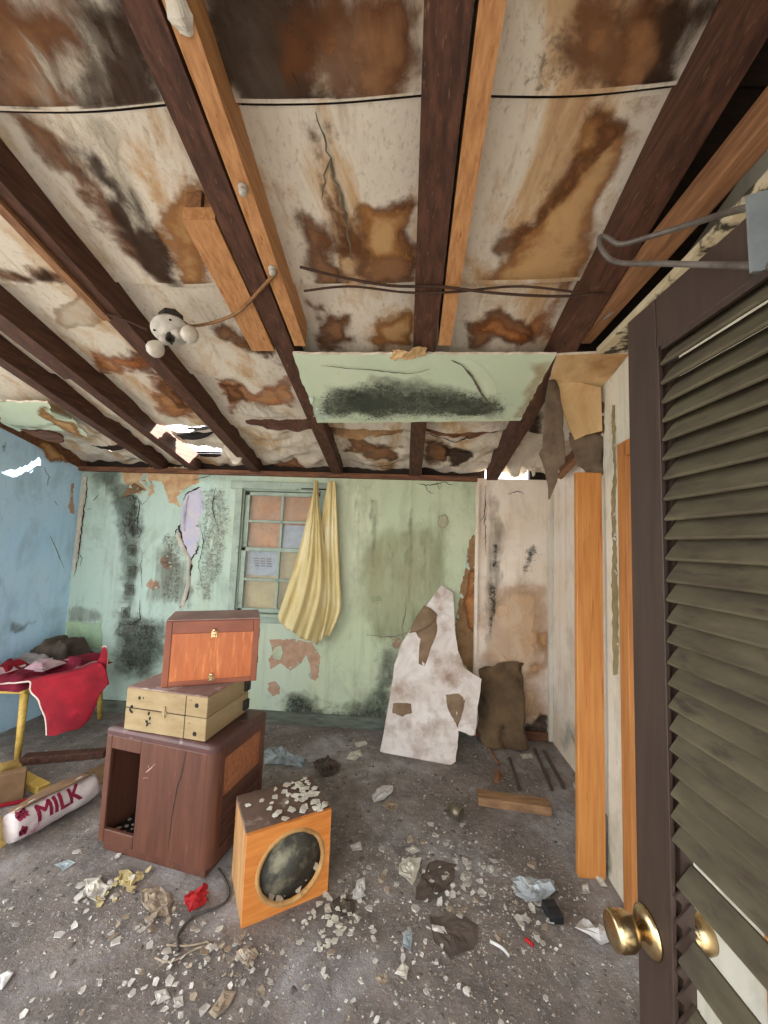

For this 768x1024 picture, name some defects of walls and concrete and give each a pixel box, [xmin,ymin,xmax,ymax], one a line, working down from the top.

leakage [206,0,418,99]
leakage [0,0,209,287]
crack [315,112,352,259]
leakage [296,187,416,285]
leakage [488,111,628,290]
leakage [323,382,503,420]
peeling [121,466,204,559]
leakage [95,472,163,677]
peeling [455,532,475,673]
leakage [489,585,505,626]
peeling [267,639,321,697]